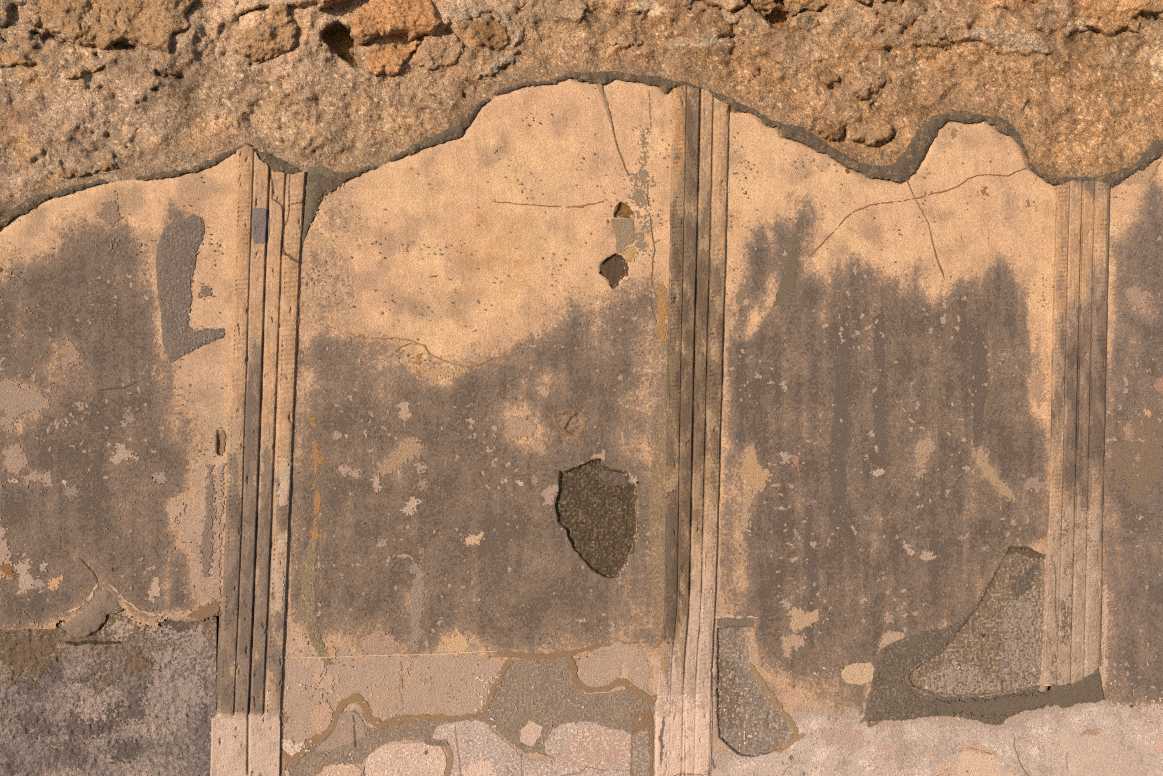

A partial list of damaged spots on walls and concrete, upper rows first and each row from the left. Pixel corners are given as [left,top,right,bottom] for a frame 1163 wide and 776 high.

spalling [599,253,628,289]
spalling [613,201,633,218]
crack [598,83,660,321]
crack [808,168,1025,278]
peeling [0,379,91,500]
water stain [0,195,217,756]
spalling [517,449,640,579]
water stain [189,85,1163,776]
peeling [579,438,1163,776]
water stain [107,735,143,766]
spalling [280,628,412,756]
spalling [317,720,631,776]